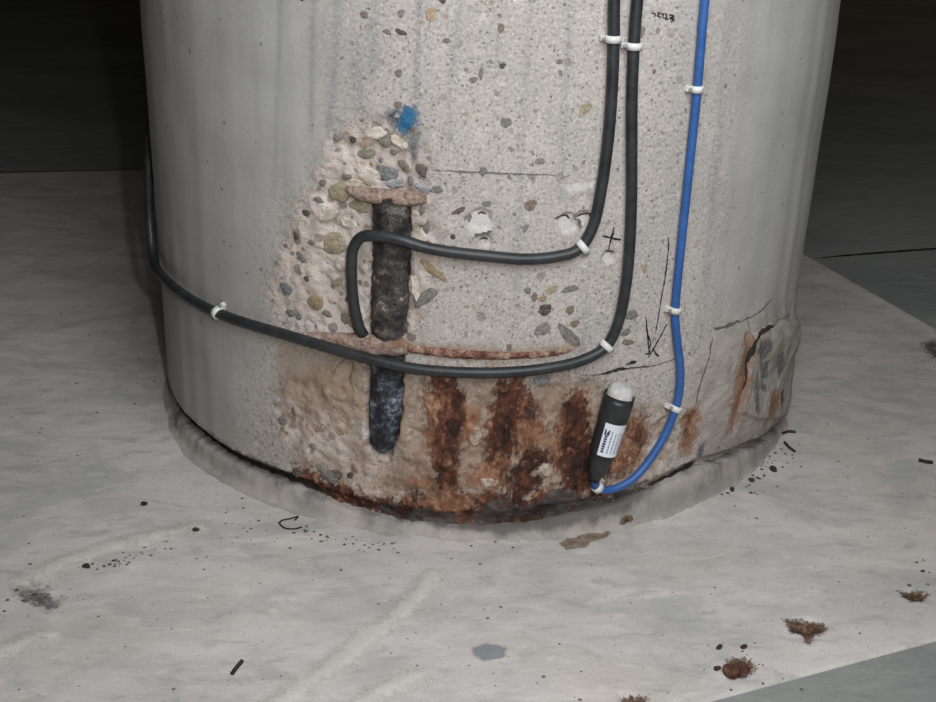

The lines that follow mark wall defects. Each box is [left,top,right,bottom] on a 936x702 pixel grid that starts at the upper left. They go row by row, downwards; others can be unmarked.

spalling [260,101,682,518]
crack [696,301,788,403]
rust [297,373,648,524]
rust [678,406,701,455]